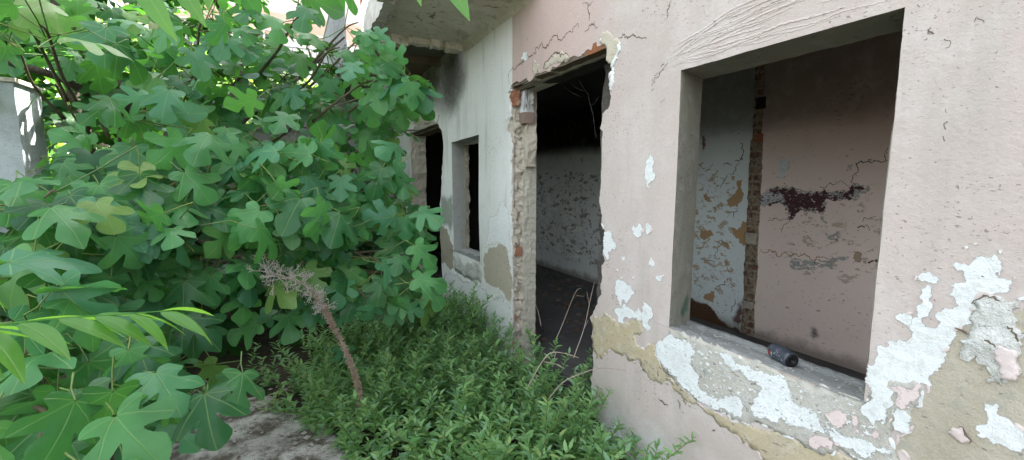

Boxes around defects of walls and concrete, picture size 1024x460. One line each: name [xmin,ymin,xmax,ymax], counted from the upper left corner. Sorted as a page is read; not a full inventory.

spalling [521,51,569,74]
crack [508,1,645,81]
spalling [599,31,621,91]
peeling [644,154,655,190]
spalling [693,64,881,337]
spalling [440,202,513,302]
spalling [536,172,1024,460]